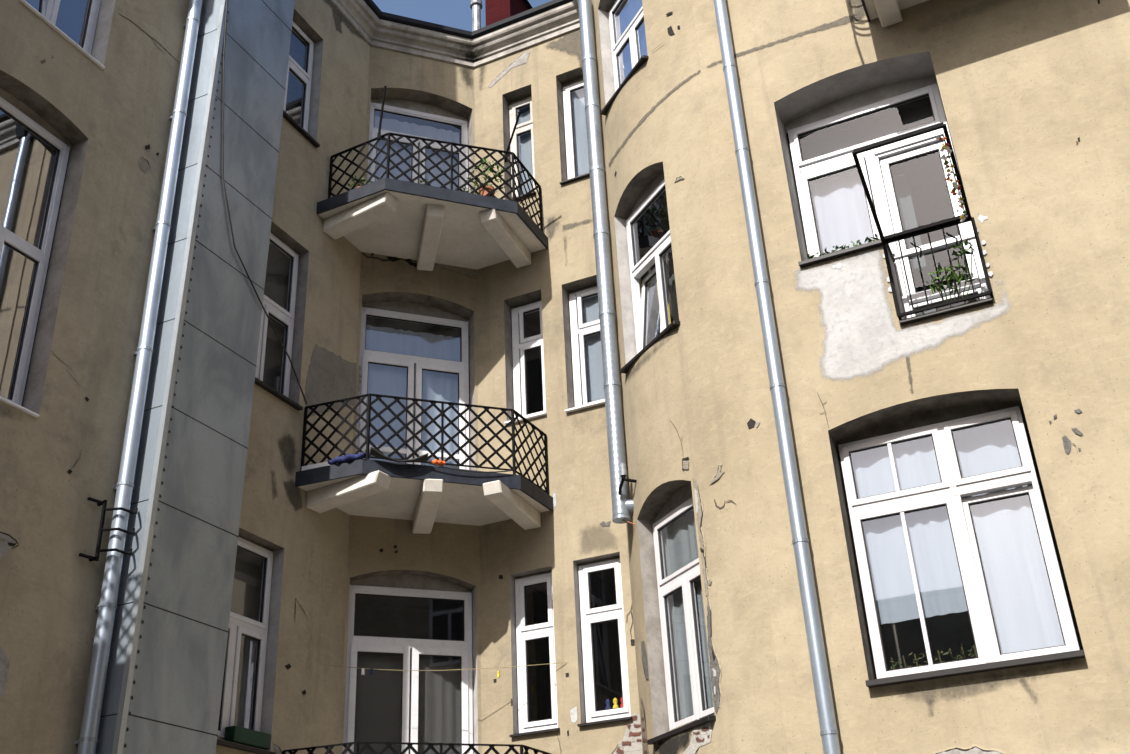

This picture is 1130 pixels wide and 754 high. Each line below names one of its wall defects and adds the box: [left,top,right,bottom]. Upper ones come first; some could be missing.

spalling [683,464,736,754]
flaking render [611,700,649,754]
spalling [932,744,1007,754]